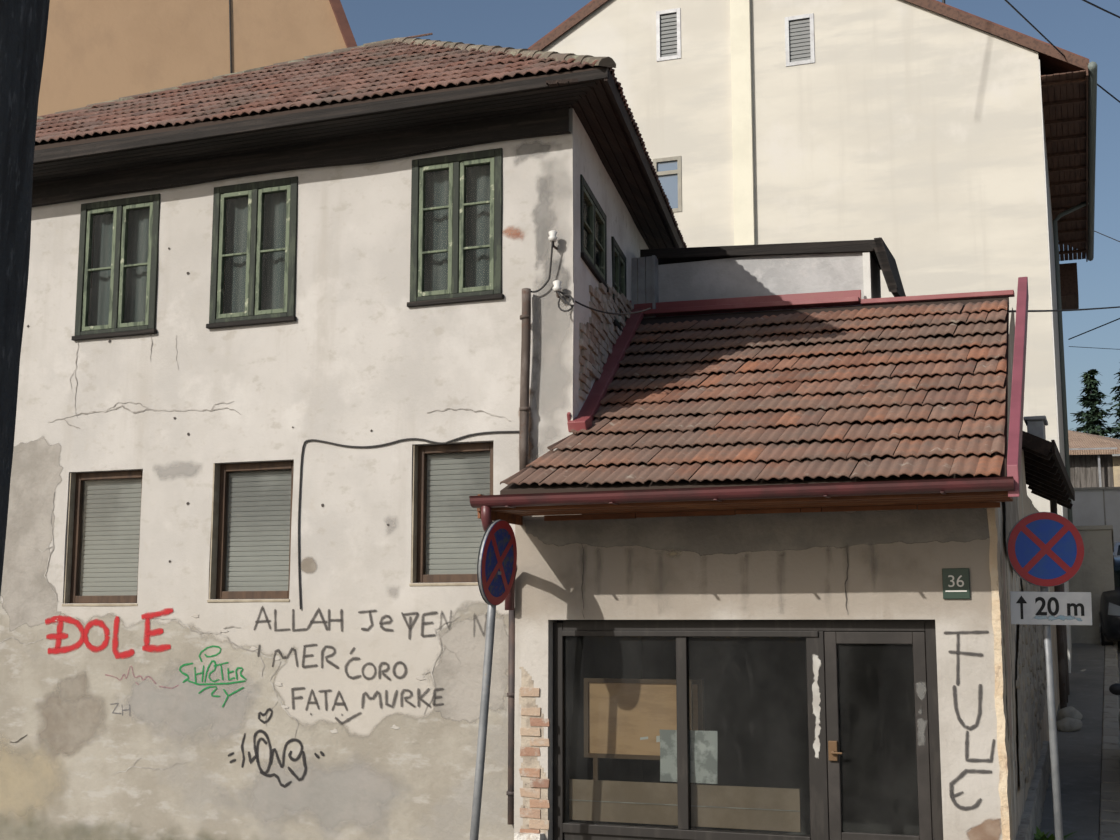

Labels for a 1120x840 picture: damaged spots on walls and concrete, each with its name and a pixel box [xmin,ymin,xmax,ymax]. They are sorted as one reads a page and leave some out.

water stain [516,142,551,161]
crack [48,340,241,428]
crack [427,408,510,421]
flaking render [578,283,634,401]
peeling [0,437,550,840]
water stain [0,674,103,817]